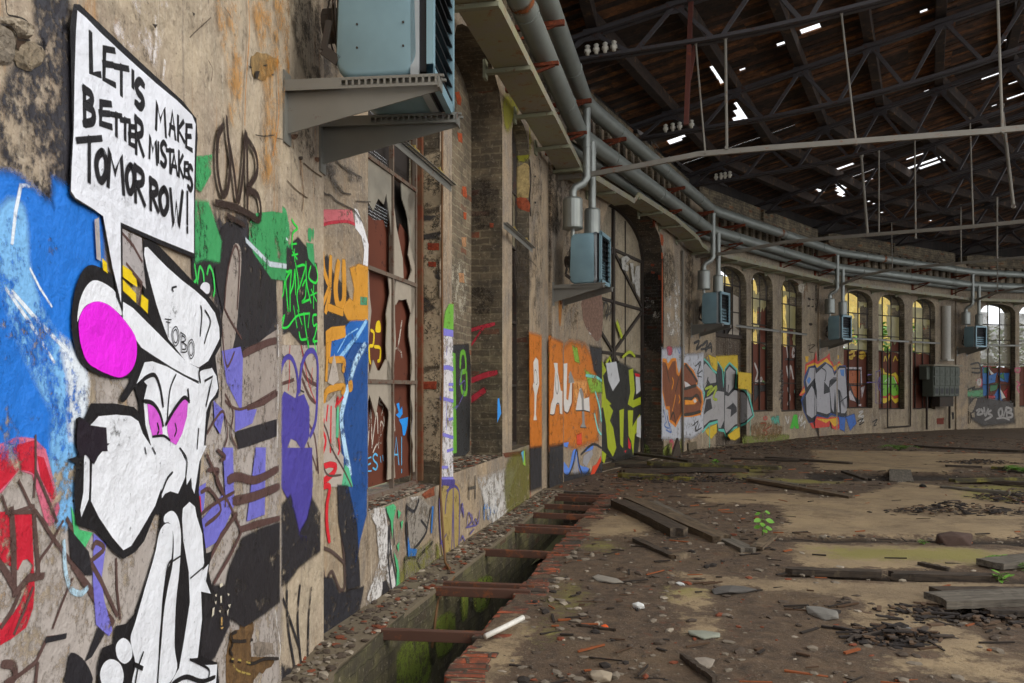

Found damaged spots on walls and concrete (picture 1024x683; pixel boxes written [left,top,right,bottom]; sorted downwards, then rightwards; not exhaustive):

flaking render [0,0,46,71]